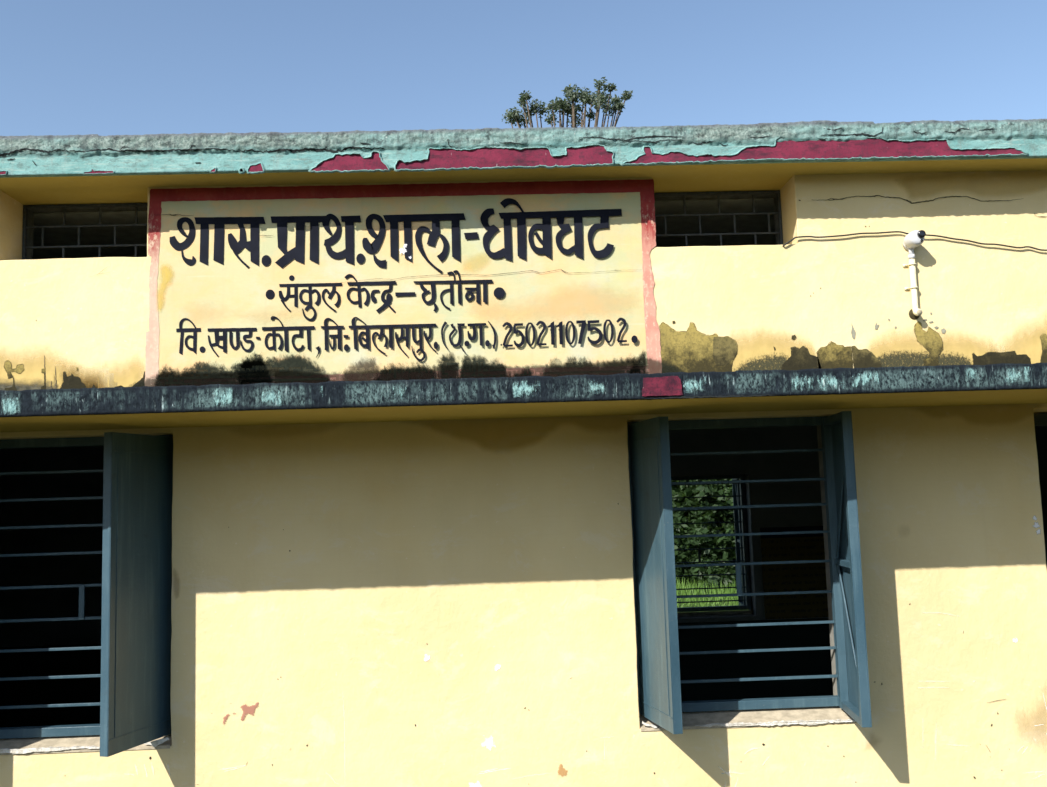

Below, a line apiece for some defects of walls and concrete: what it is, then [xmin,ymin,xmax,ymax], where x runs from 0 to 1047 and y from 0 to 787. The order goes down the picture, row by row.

peeling [238,162,265,174]
peeling [308,136,1029,173]
crack [828,195,1047,217]
damp [0,351,682,391]
damp [732,336,815,372]
damp [870,327,1047,367]
peeling [223,702,258,724]